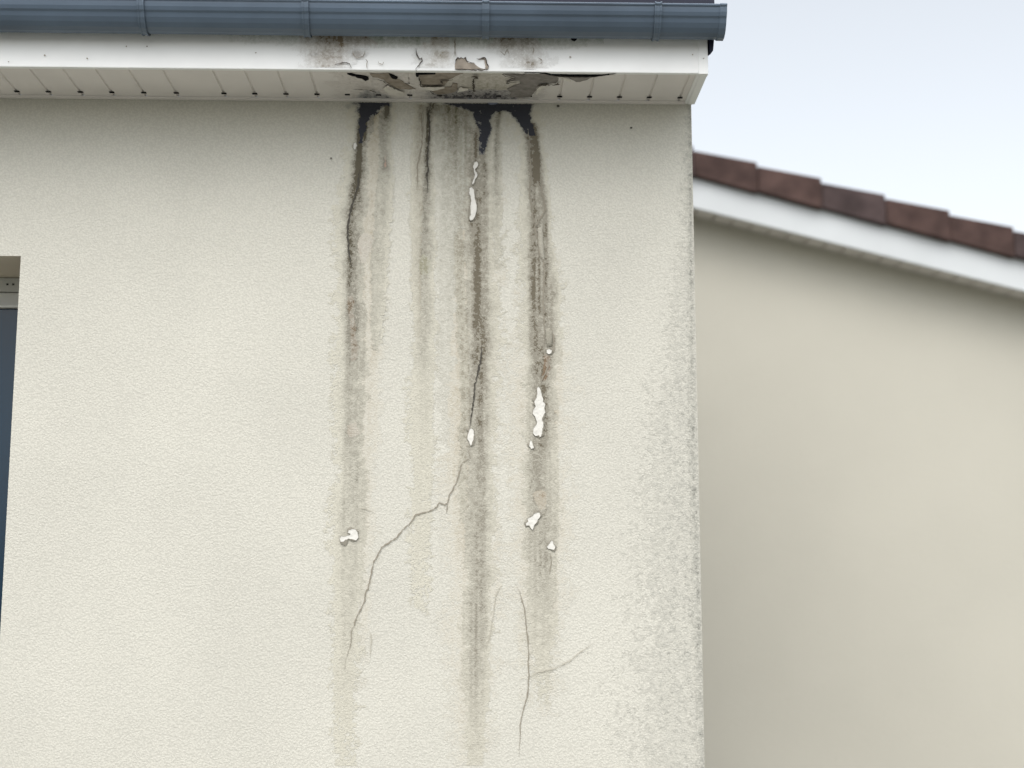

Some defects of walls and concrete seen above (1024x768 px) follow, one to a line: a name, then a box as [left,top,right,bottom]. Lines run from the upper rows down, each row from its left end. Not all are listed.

peeling [370,58,488,96]
peeling [502,73,614,98]
flaking render [468,161,479,221]
leakage [322,72,567,766]
flaking render [527,386,546,449]
flaking render [339,527,359,546]
crack [345,346,482,662]
flaking render [524,511,542,530]
crack [486,587,593,747]